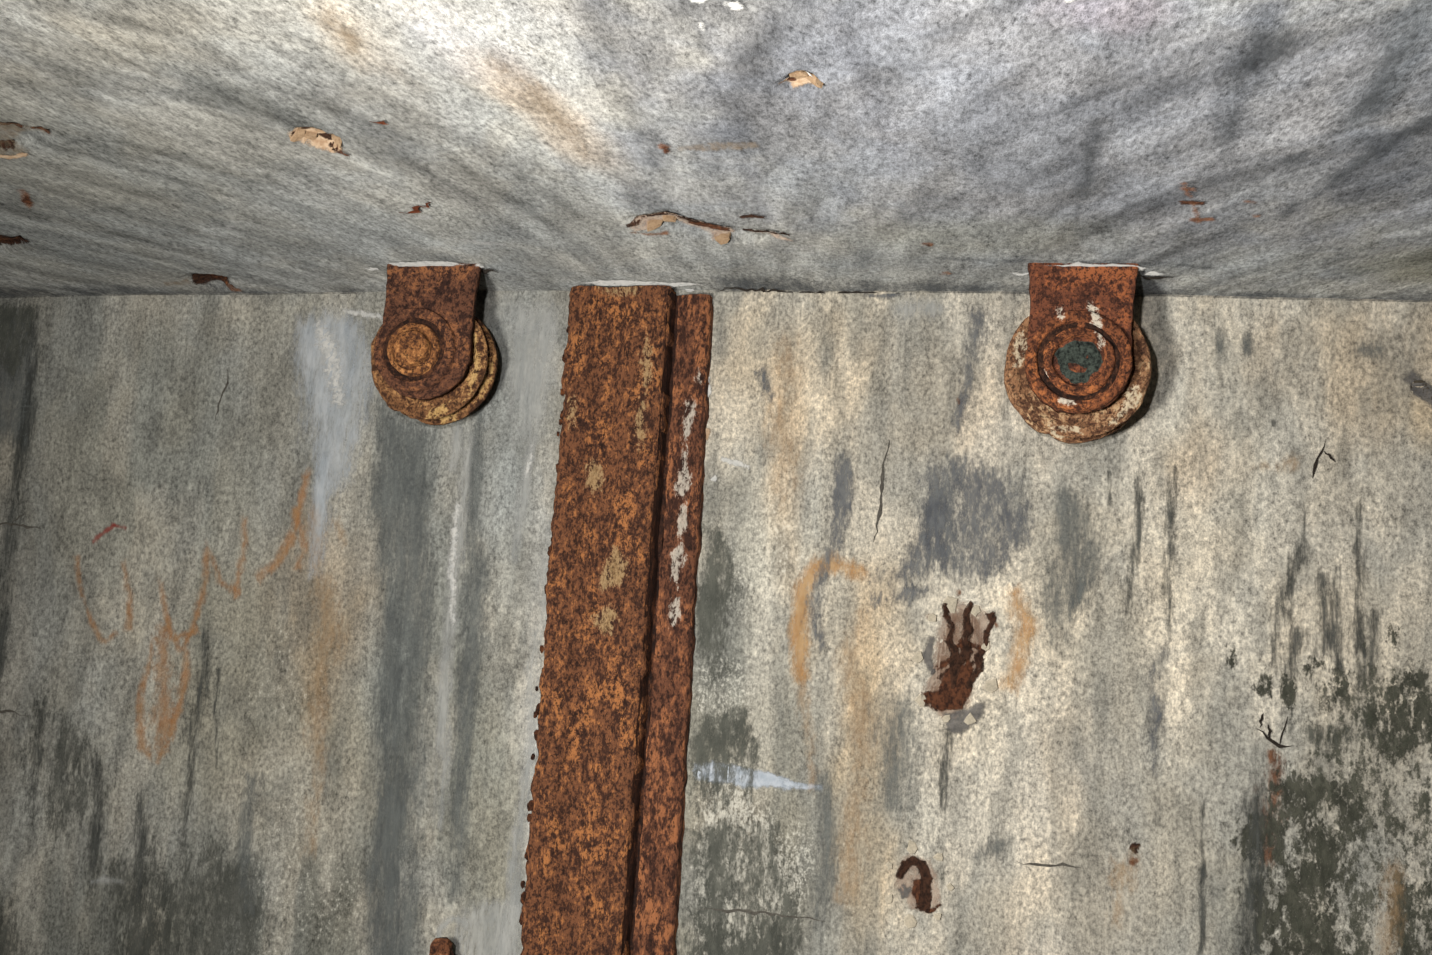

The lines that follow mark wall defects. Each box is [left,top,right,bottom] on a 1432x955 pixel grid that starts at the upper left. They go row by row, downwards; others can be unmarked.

spalling [780,70,824,88]
spalling [289,127,349,156]
spalling [0,235,29,245]
spalling [626,212,791,245]
damp [0,287,228,675]
rust [531,645,544,760]
damp [885,704,910,807]
damp [1230,520,1432,955]
damp [675,707,802,955]
damp [782,780,832,885]